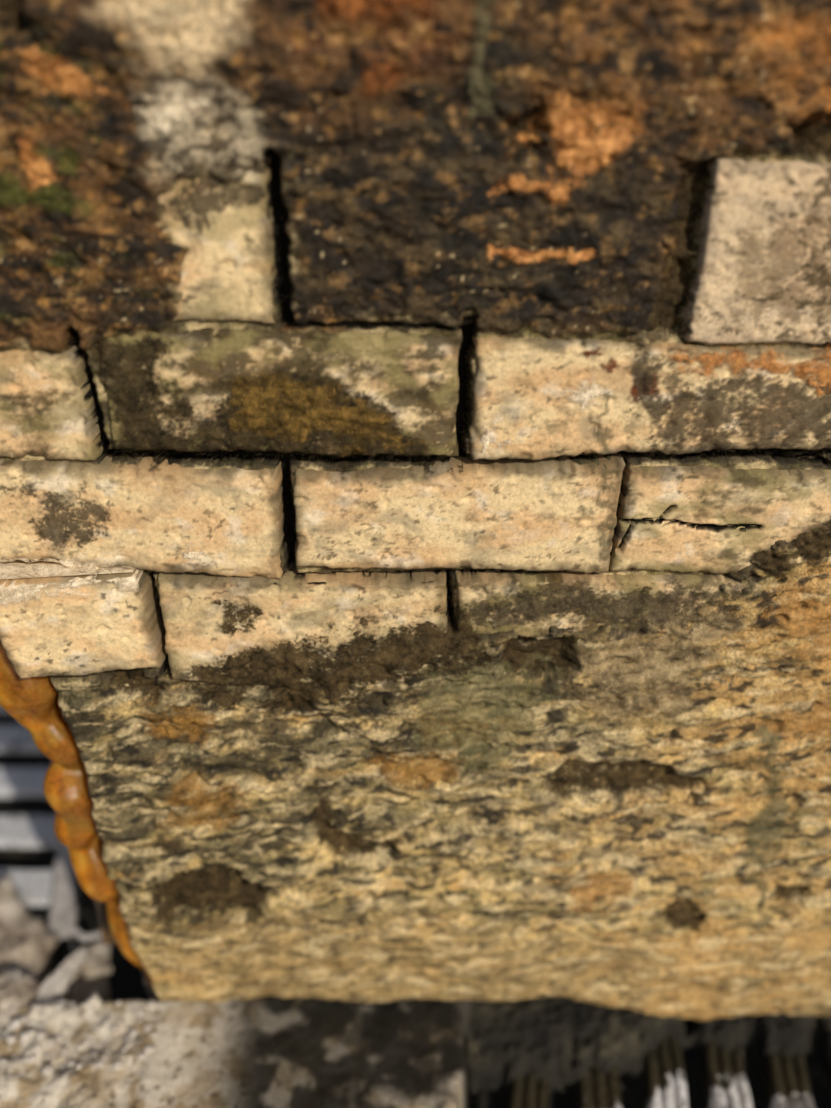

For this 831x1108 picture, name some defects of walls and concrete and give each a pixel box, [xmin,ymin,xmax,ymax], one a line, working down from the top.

water stain [0,0,831,574]
crack [556,448,831,548]
water stain [50,519,831,1021]